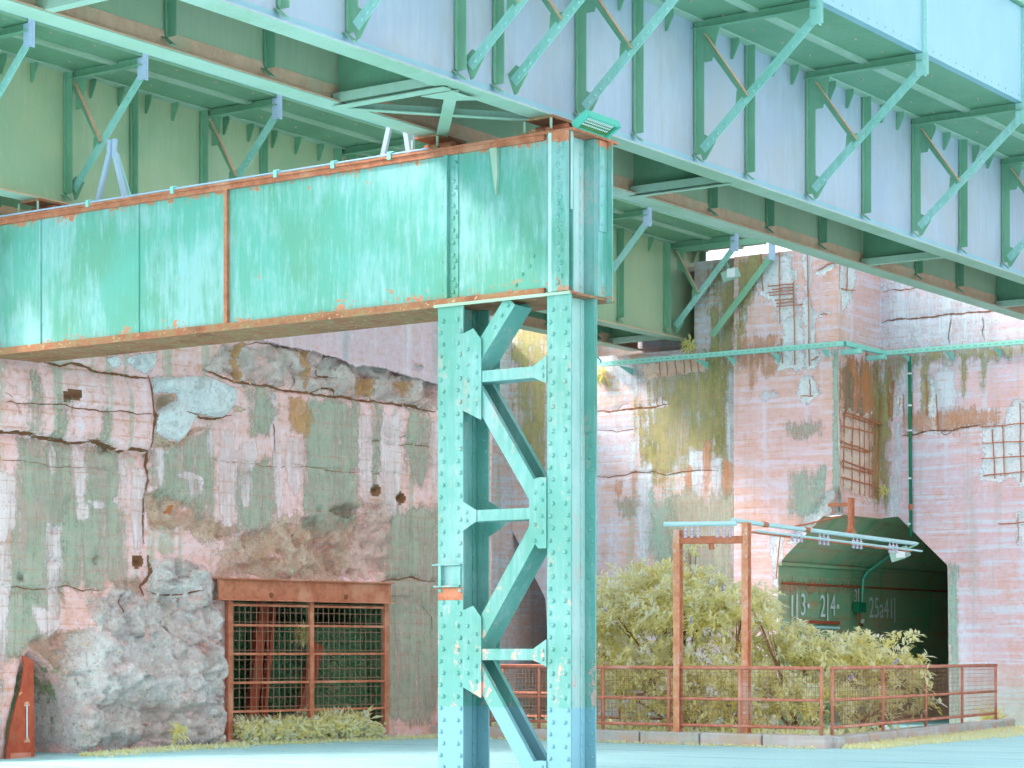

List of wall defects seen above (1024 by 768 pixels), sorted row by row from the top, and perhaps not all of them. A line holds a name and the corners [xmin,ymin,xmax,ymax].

crack [187,411,232,420]
crack [205,342,436,412]
crack [597,403,667,432]
water stain [610,355,657,576]
water stain [688,357,734,497]
spalling [756,251,857,406]
spalling [769,366,943,586]
corrosion [839,354,880,445]
crack [882,310,991,343]
spalling [979,399,1024,487]
water stain [0,471,17,667]
water stain [32,523,62,638]